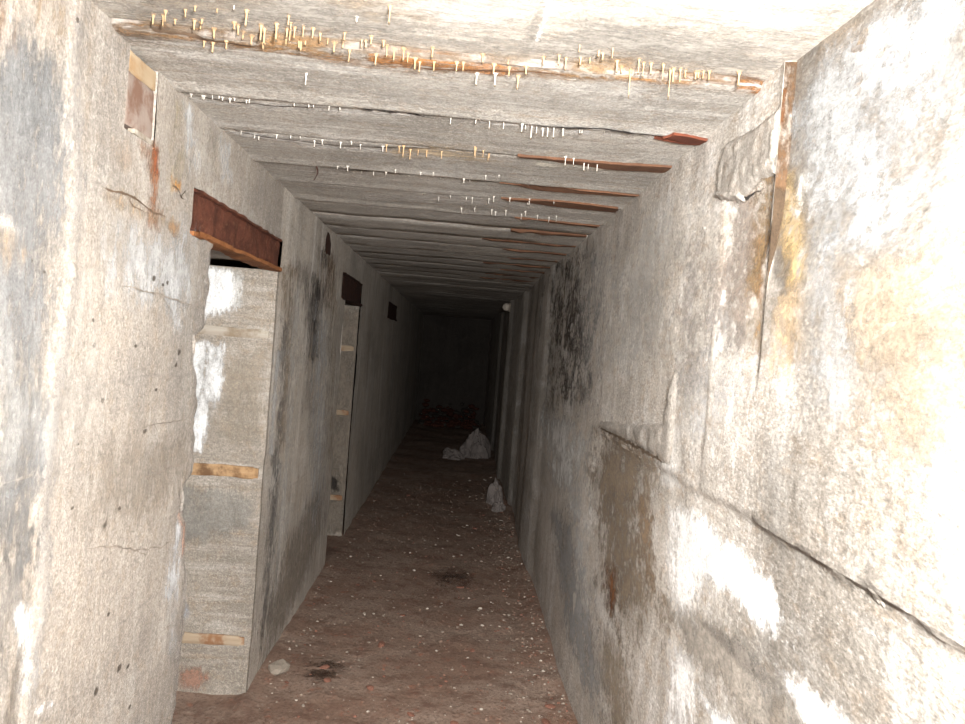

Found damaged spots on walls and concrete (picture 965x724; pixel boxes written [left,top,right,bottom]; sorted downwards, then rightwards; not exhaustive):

corrosion [114,21,200,41]
corrosion [217,30,764,93]
corrosion [141,142,159,225]
water stain [109,0,965,465]
water stain [308,280,359,535]